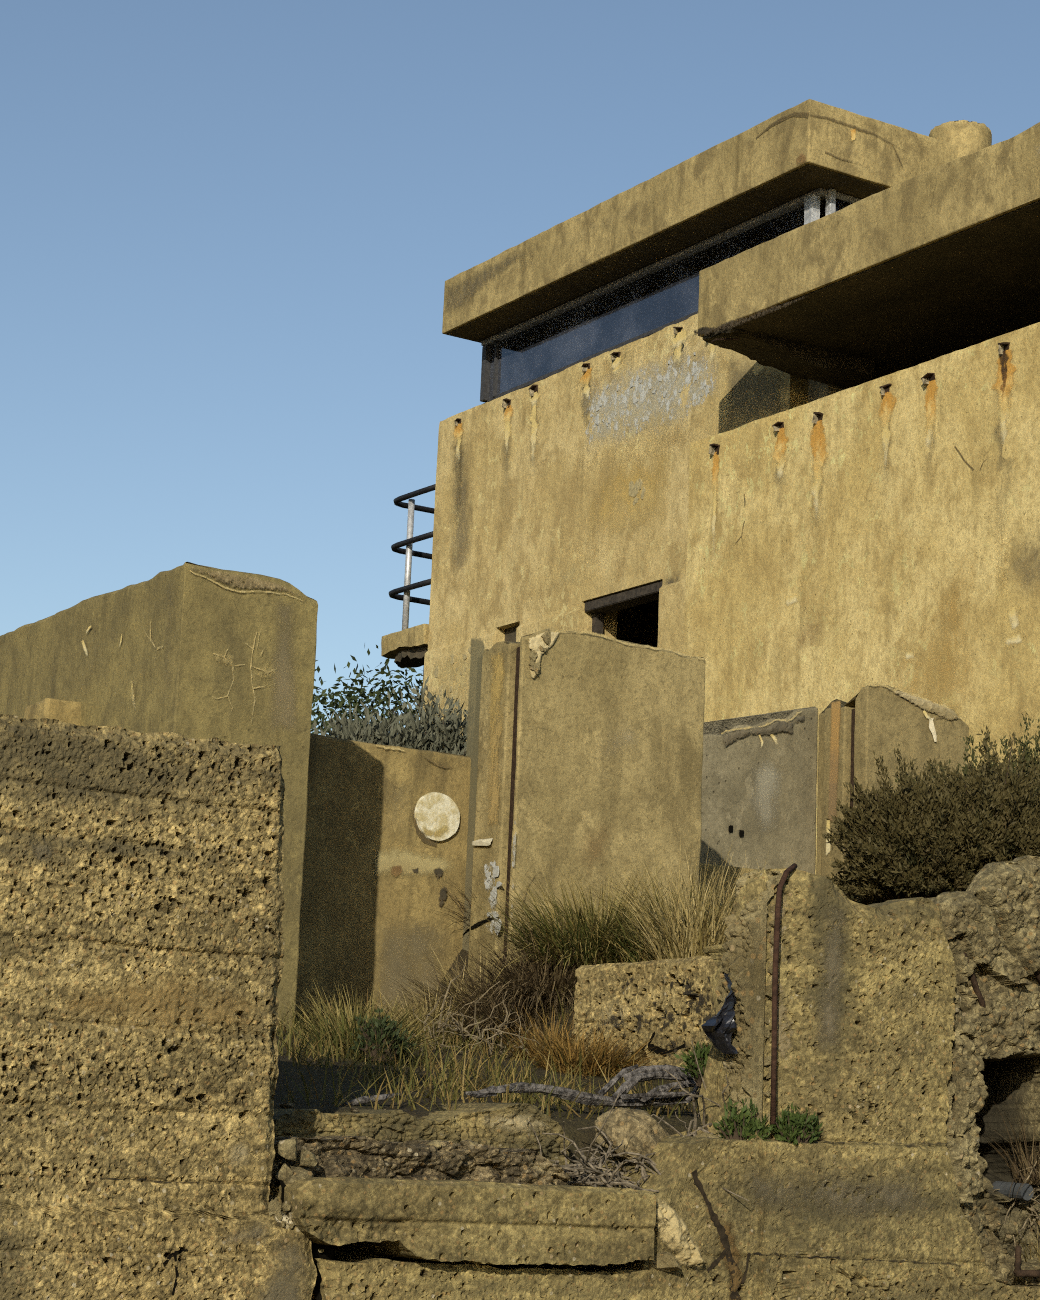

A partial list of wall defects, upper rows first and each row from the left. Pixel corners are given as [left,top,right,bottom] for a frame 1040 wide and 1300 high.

crack [756,112,903,166]
corrosion [993,349,1016,440]
corrosion [811,420,828,510]
crack [213,632,274,710]
spalling [529,628,708,678]
spalling [721,711,805,746]
spalling [928,855,1040,1285]
crack [274,1138,317,1203]
crack [311,1242,334,1300]
crack [692,1169,961,1300]